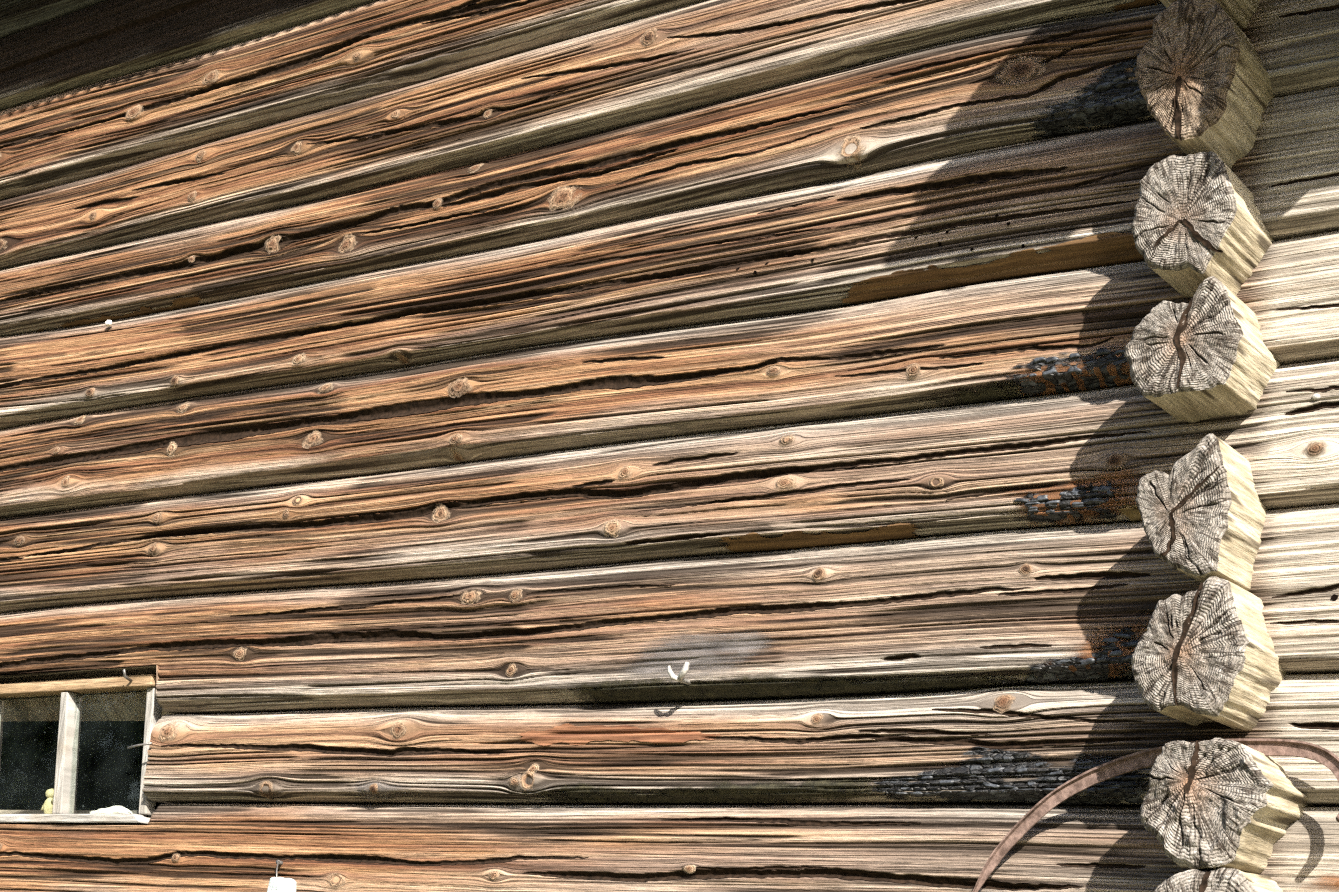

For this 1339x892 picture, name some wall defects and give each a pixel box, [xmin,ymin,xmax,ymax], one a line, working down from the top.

crack [0,0,538,149]
crack [307,0,919,144]
crack [1174,75,1182,142]
crack [1154,218,1223,253]
crack [1174,297,1193,387]
crack [0,431,1152,563]
crack [0,466,1219,668]
crack [1172,583,1203,706]
crack [1184,740,1200,793]
crack [663,817,921,826]
crack [0,851,1145,891]
crack [1199,870,1211,892]